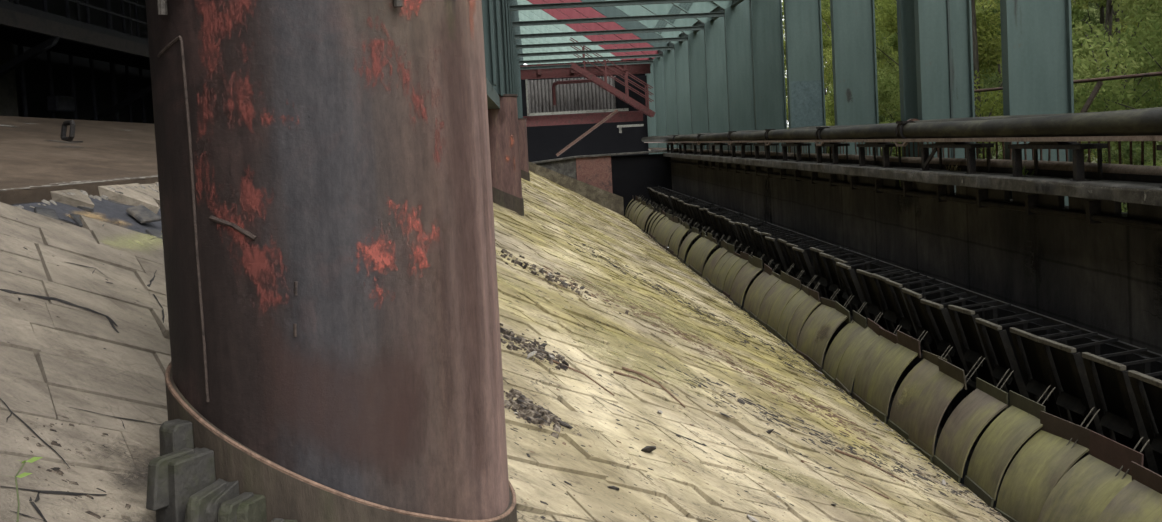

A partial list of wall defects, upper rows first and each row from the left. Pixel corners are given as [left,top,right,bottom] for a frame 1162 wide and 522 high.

crack [0,289,119,333]
crack [0,399,107,522]